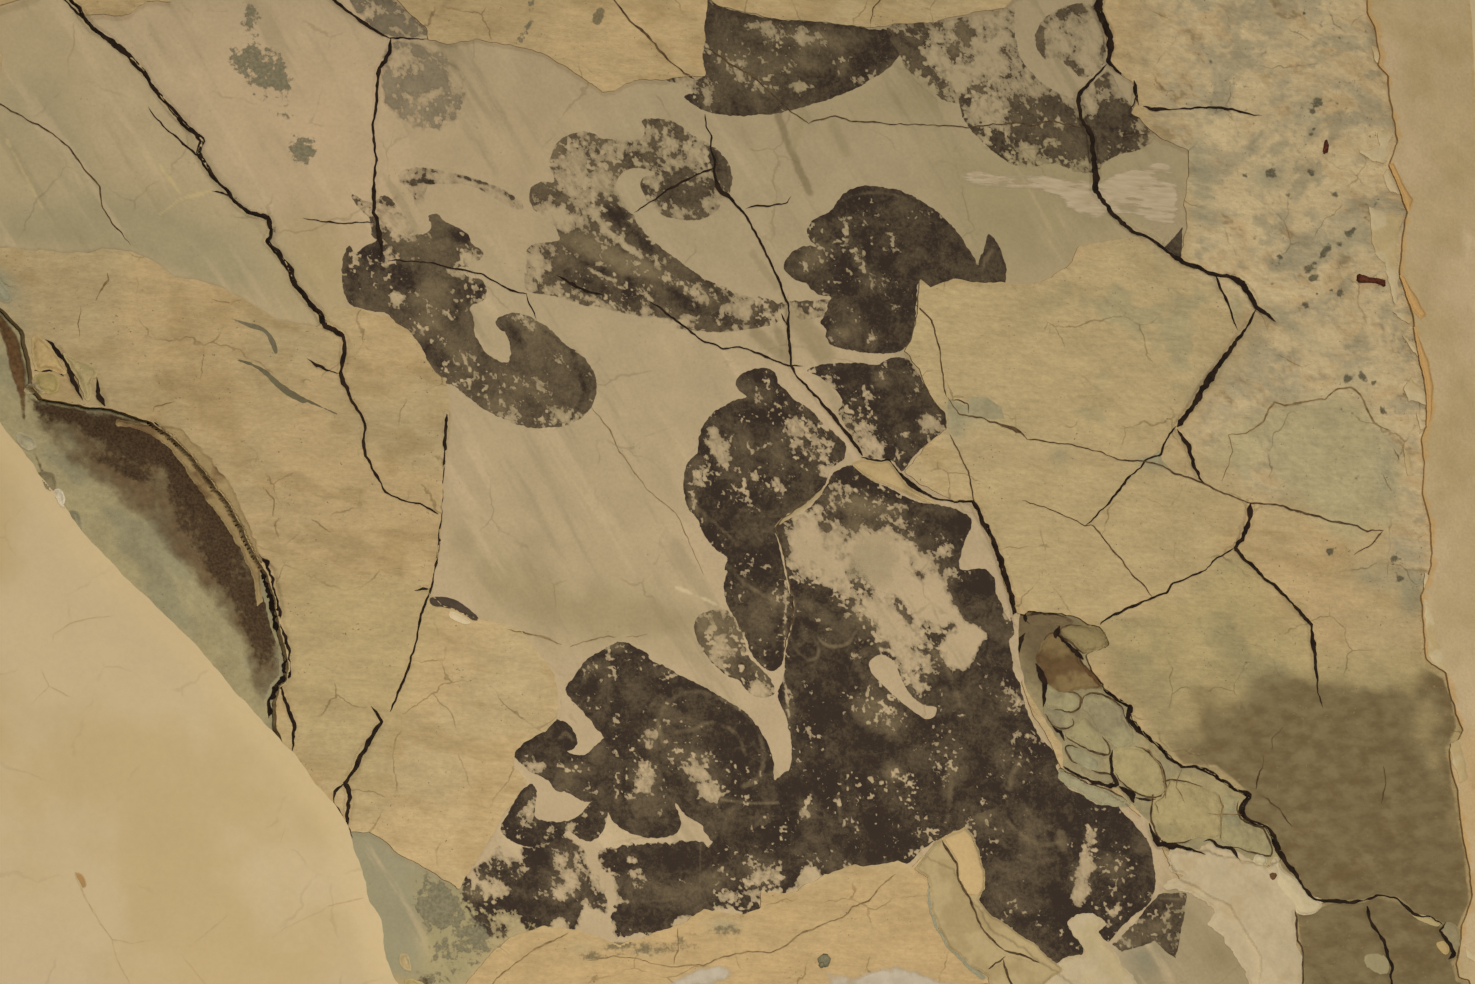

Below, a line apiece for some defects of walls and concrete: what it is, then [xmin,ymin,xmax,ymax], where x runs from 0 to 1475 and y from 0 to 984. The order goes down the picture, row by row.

flaking render [702,7,828,95]
crack [34,273,109,406]
flaking render [0,311,284,734]
crack [64,0,602,836]
crack [614,0,1399,707]
flaking render [351,718,762,984]
flaking render [712,782,833,915]
flaking render [827,768,1072,984]
crack [942,840,1040,984]
flaking render [1070,824,1137,932]
crack [1063,689,1456,984]
water stain [1181,673,1468,984]